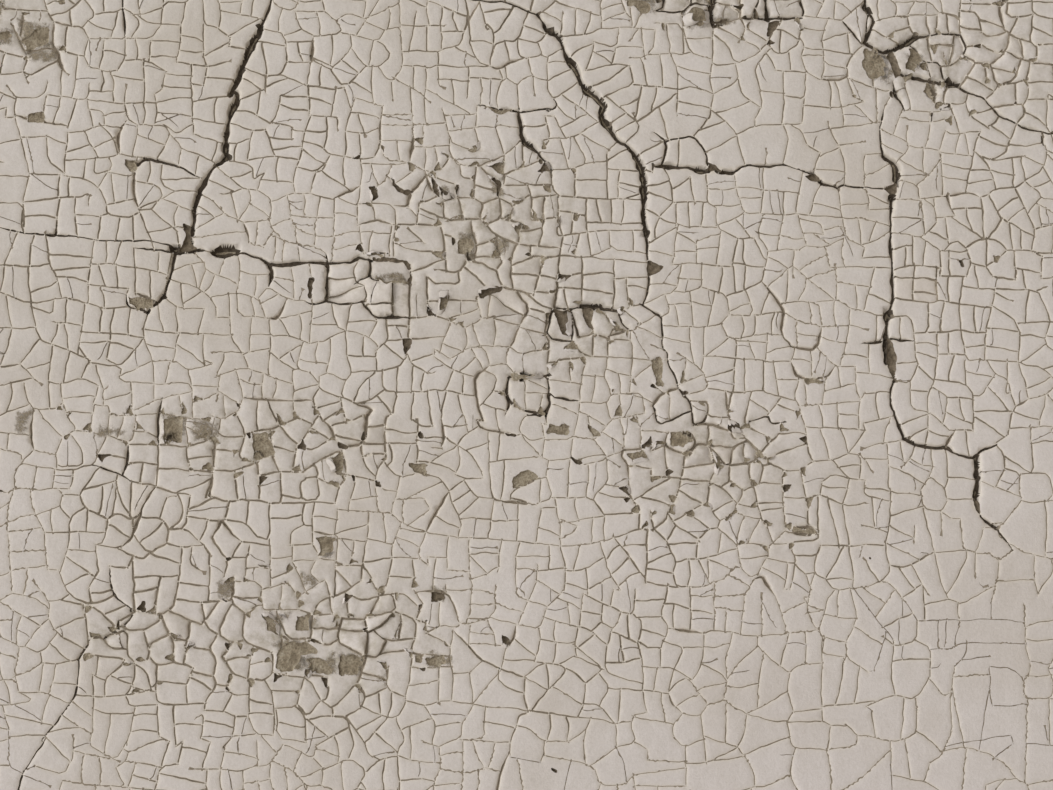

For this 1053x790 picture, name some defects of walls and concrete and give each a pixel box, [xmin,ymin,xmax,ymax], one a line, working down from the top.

peeling [862,28,967,125]
peeling [356,244,412,285]
peeling [392,141,543,261]
crack [0,0,1053,627]
peeling [111,396,221,447]
peeling [232,411,301,479]
crack [0,565,122,790]
crack [76,566,486,790]
peeling [225,563,365,691]
crack [427,630,529,772]
crack [496,401,837,790]
crack [727,358,1053,790]